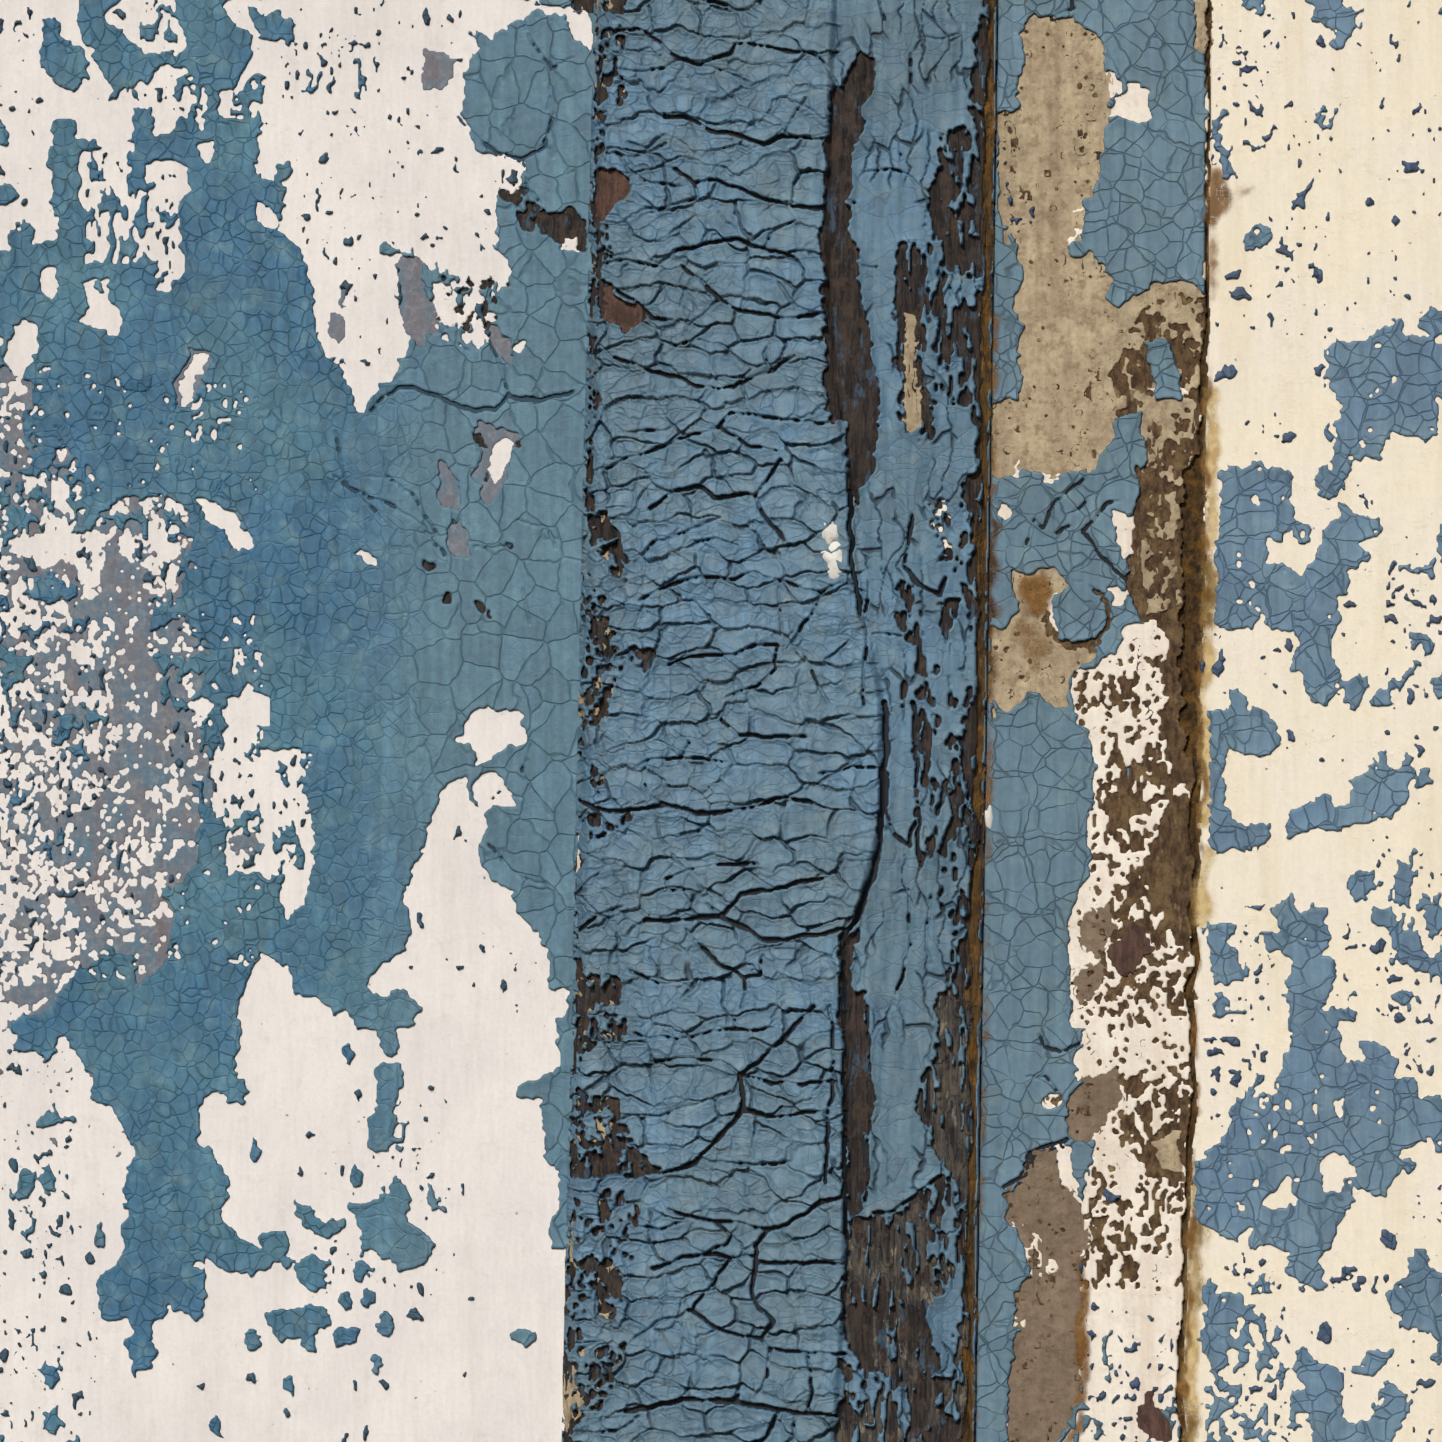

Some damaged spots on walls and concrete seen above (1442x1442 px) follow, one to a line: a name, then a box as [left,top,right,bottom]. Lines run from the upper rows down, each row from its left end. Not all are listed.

peeling [0,0,594,413]
crack [703,0,729,8]
crack [599,109,835,550]
crack [610,28,839,92]
peeling [0,319,595,1442]
crack [577,486,947,1442]
peeling [940,0,1442,1442]
peeling [851,1413,868,1442]
peeling [850,1214,926,1391]
peeling [914,1392,944,1442]